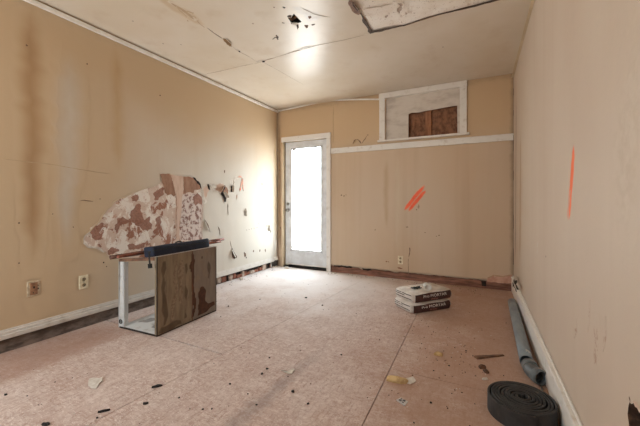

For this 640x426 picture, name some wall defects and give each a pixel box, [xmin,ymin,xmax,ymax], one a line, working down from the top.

peeling [348,0,498,34]
peeling [82,173,228,258]
spalling [217,263,272,284]